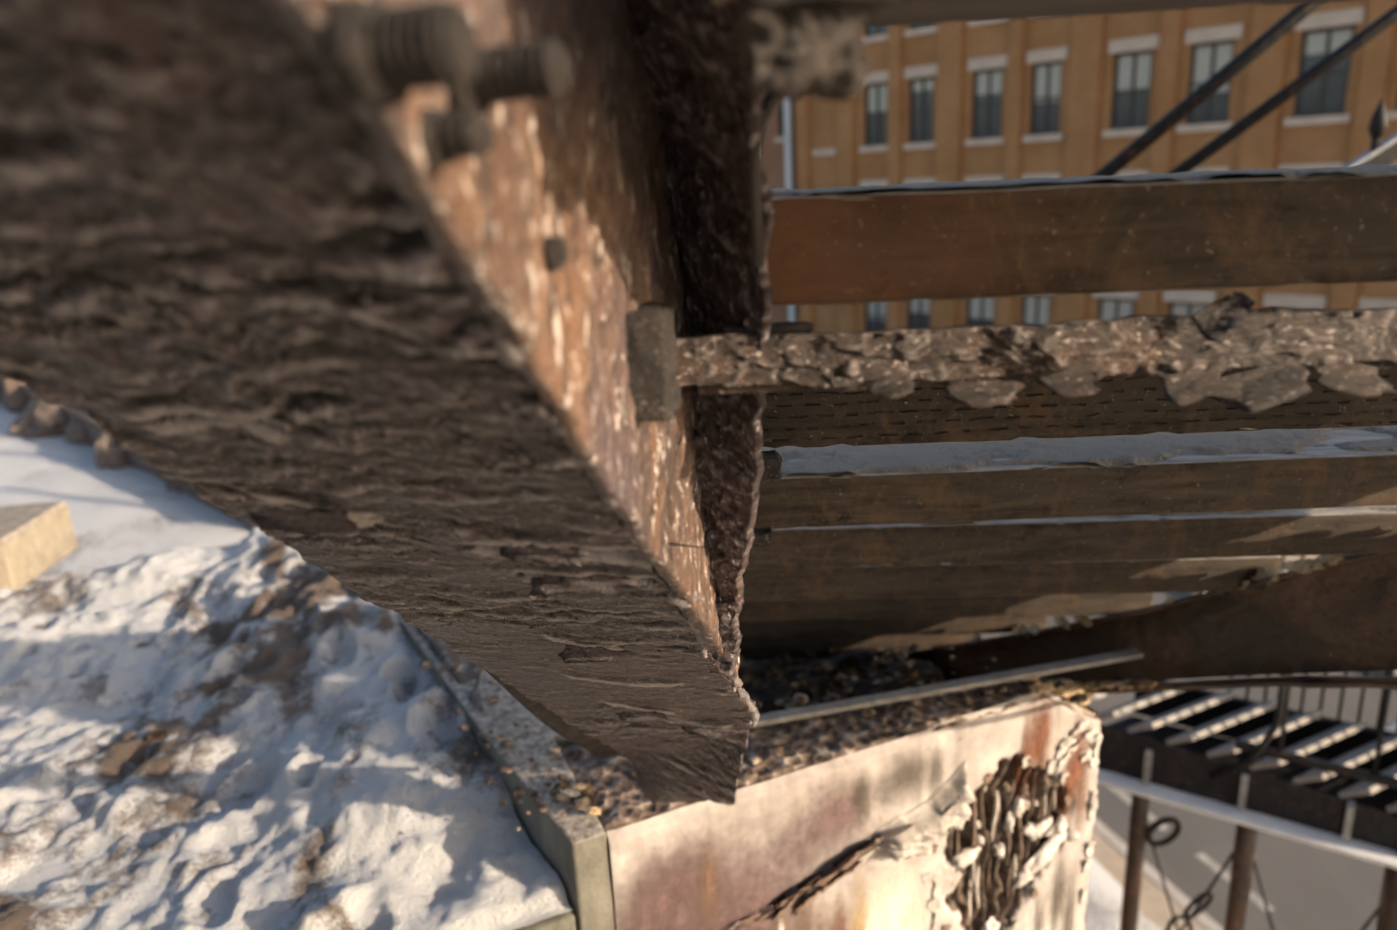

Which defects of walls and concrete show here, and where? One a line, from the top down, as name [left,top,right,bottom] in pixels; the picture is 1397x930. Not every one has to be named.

corrosion [734,0,871,101]
corrosion [1223,553,1374,595]
corrosion [1074,679,1157,691]
corrosion [798,791,866,845]
spalling [921,721,1103,930]
corrosion [1016,711,1050,793]
corrosion [1057,736,1086,818]
corrosion [651,851,803,930]
crack [726,836,881,930]
crack [929,876,937,930]